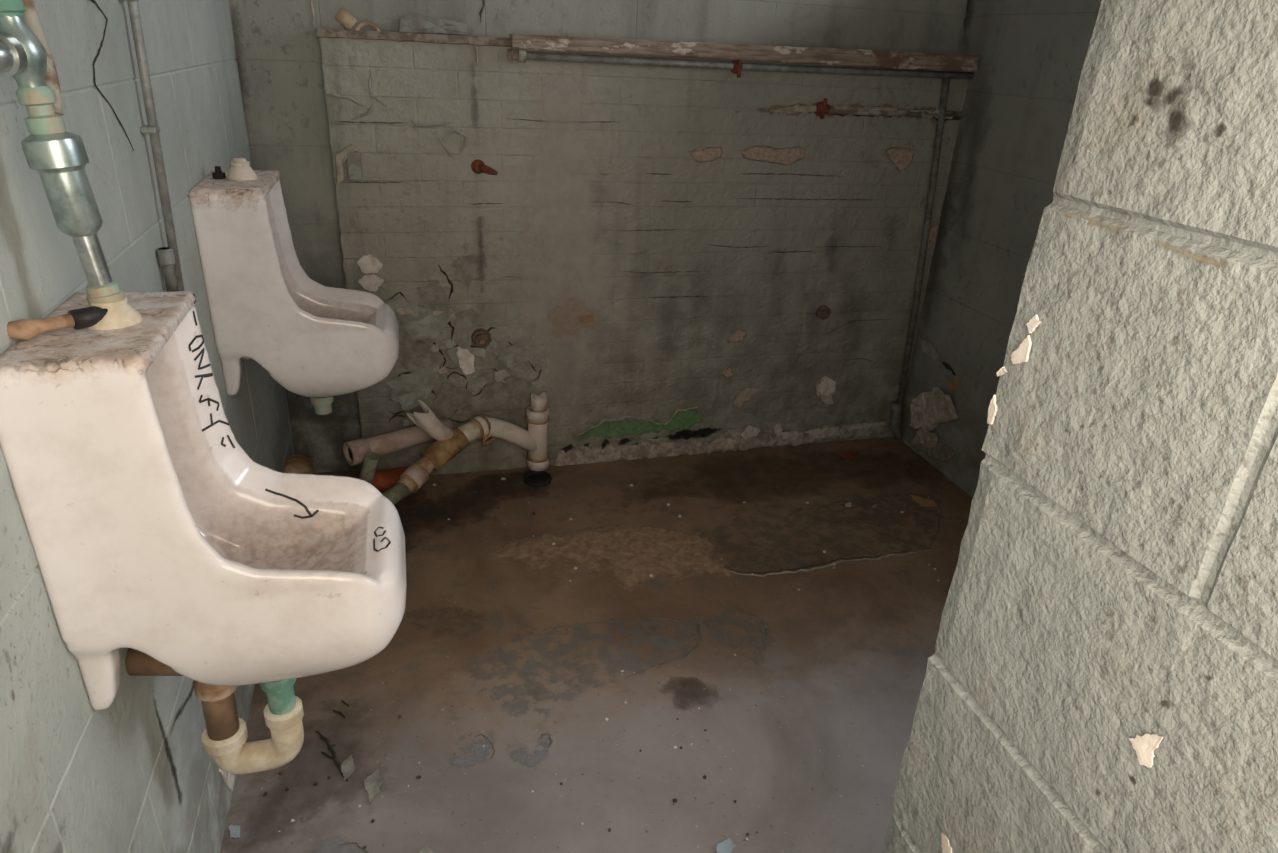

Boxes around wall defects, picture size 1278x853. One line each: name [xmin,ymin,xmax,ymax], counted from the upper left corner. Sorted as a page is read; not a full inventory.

peeling [384,254,542,426]
spalling [997,315,1041,376]
peeling [563,406,720,453]
flaking render [815,376,837,405]
spalling [987,395,997,425]
peeling [1129,734,1163,768]